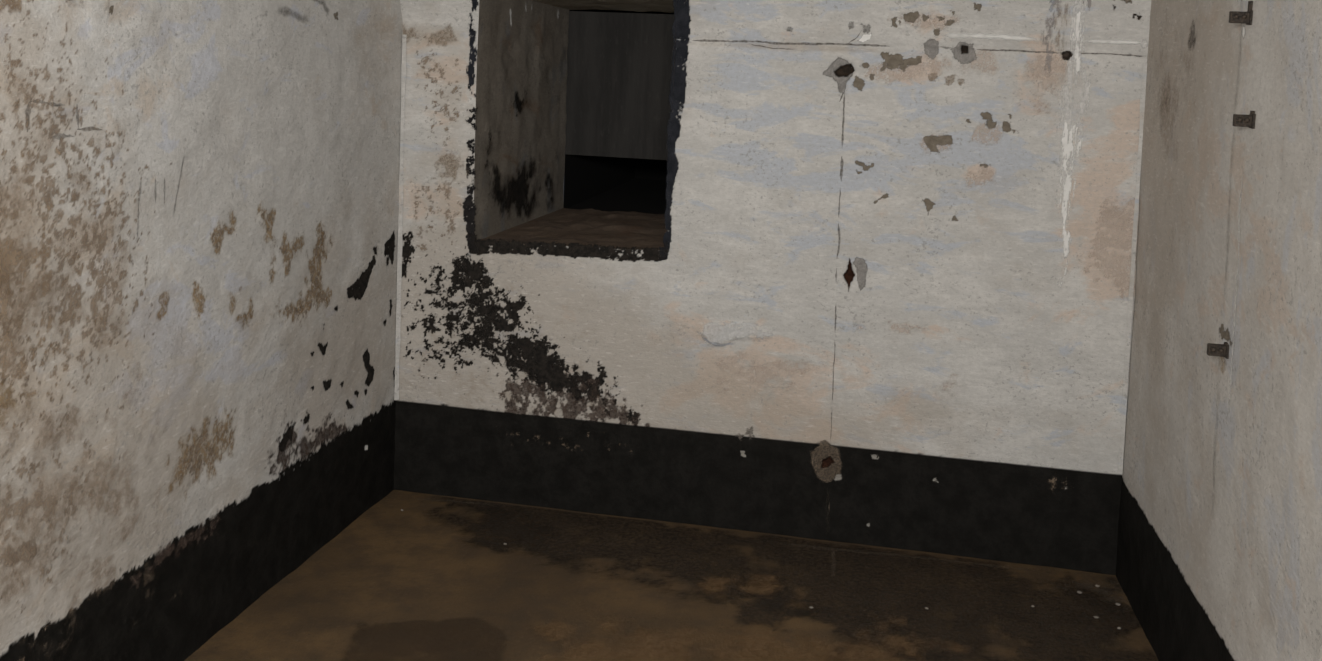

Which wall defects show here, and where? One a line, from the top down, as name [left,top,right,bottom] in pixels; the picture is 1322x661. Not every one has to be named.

water stain [0,0,29,14]
flaking render [849,22,872,42]
spalling [891,11,955,36]
spalling [834,52,963,91]
spalling [966,112,1015,142]
spalling [921,135,952,153]
water stain [0,27,150,444]
water stain [402,26,650,427]
water stain [269,412,347,475]
spalling [821,457,842,480]
water stain [0,442,128,598]